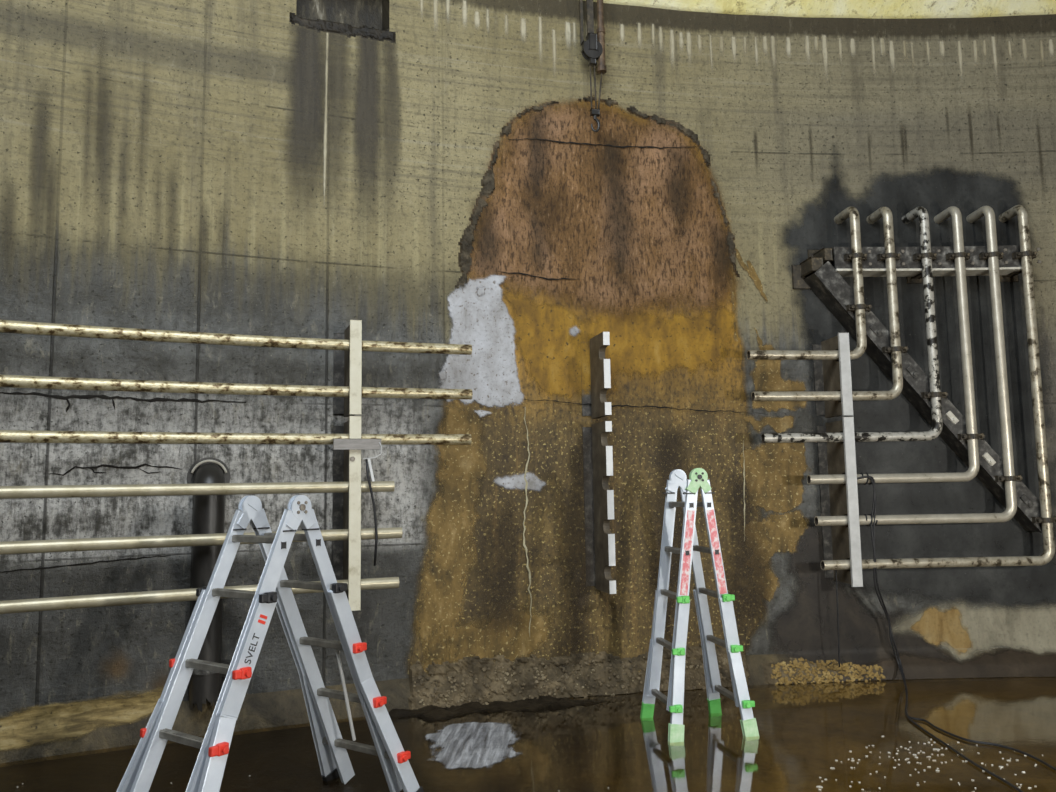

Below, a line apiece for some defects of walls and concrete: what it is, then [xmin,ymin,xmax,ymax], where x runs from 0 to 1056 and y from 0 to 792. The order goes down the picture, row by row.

water stain [290,25,399,195]
peeling [438,101,559,417]
crack [509,138,696,149]
spalling [578,96,768,341]
water stain [638,23,790,64]
water stain [784,168,1032,271]
crack [50,463,179,476]
crack [0,392,246,412]
peeling [495,473,545,491]
rust [408,101,808,673]
crack [523,399,763,635]
water stain [771,273,1056,681]